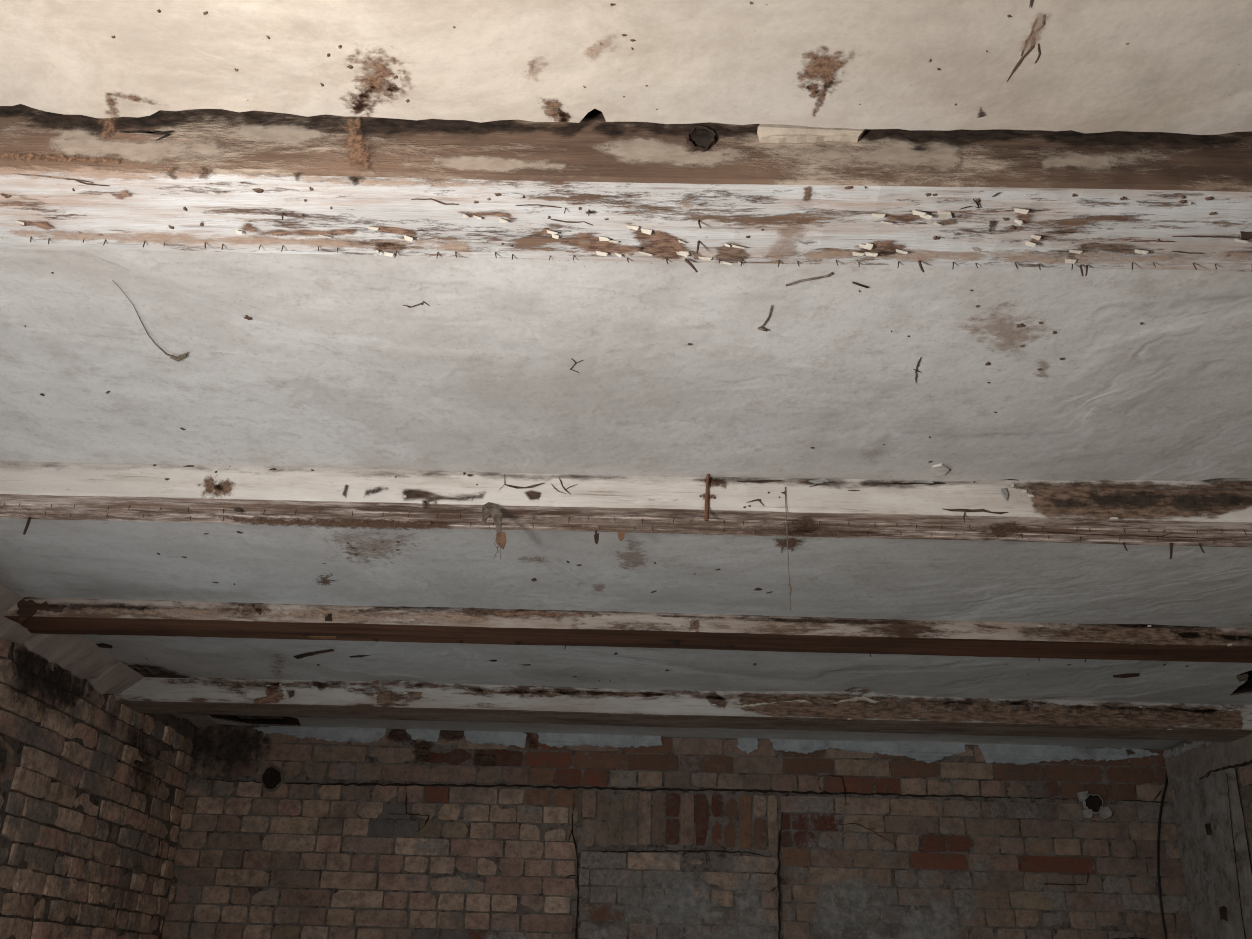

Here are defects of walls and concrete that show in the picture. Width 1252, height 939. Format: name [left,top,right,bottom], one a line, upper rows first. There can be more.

peeling [16,221,54,230]
peeling [235,223,416,257]
peeling [458,212,515,223]
peeling [532,225,749,265]
peeling [852,241,908,257]
peeling [871,210,954,226]
peeling [1014,208,1047,247]
peeling [1065,243,1149,264]
spalling [1235,231,1252,243]
peeling [1000,481,1252,520]
peeling [254,680,663,704]